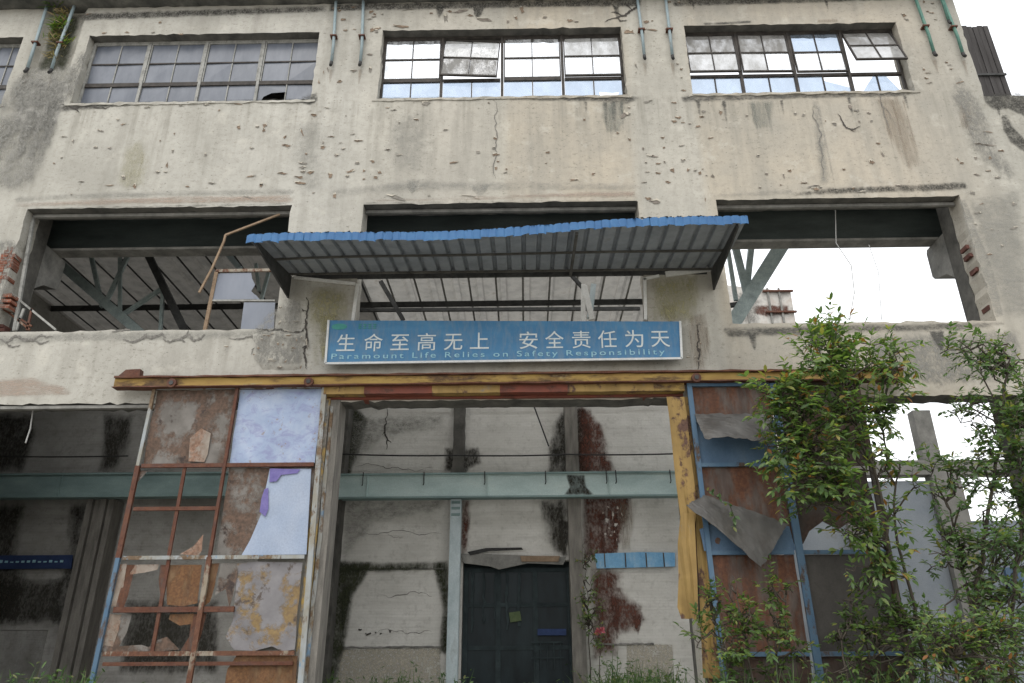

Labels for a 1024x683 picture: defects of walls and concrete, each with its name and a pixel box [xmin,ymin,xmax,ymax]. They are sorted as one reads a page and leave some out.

spalling [278,152,315,193]
crack [491,103,499,178]
crack [812,106,860,175]
crack [230,297,309,369]
crack [356,410,429,472]
mould [446,449,480,470]
mould [549,415,566,472]
corrosion [566,409,629,556]
mould [542,500,568,555]
mould [330,562,448,683]
corrosion [594,570,643,658]